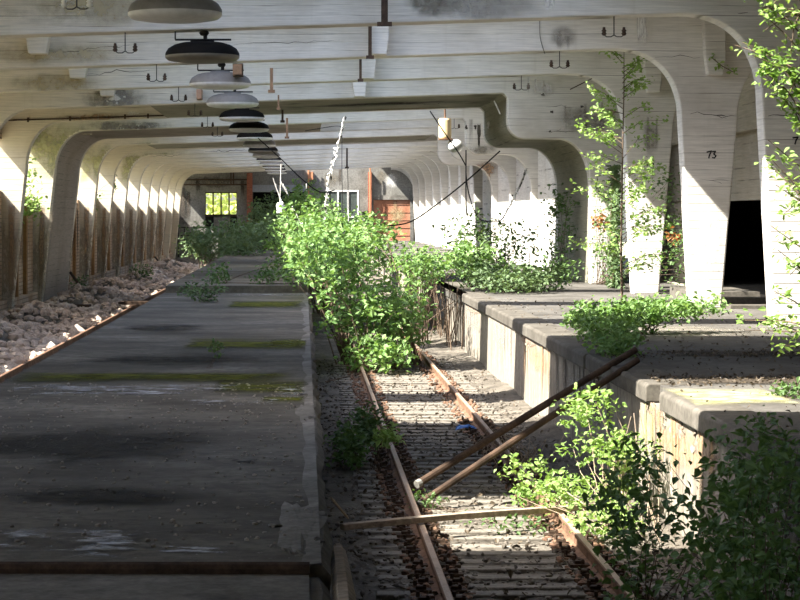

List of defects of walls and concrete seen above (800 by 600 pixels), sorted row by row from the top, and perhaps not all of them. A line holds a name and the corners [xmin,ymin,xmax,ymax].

water stain [413,0,504,16]
spalling [268,501,327,556]